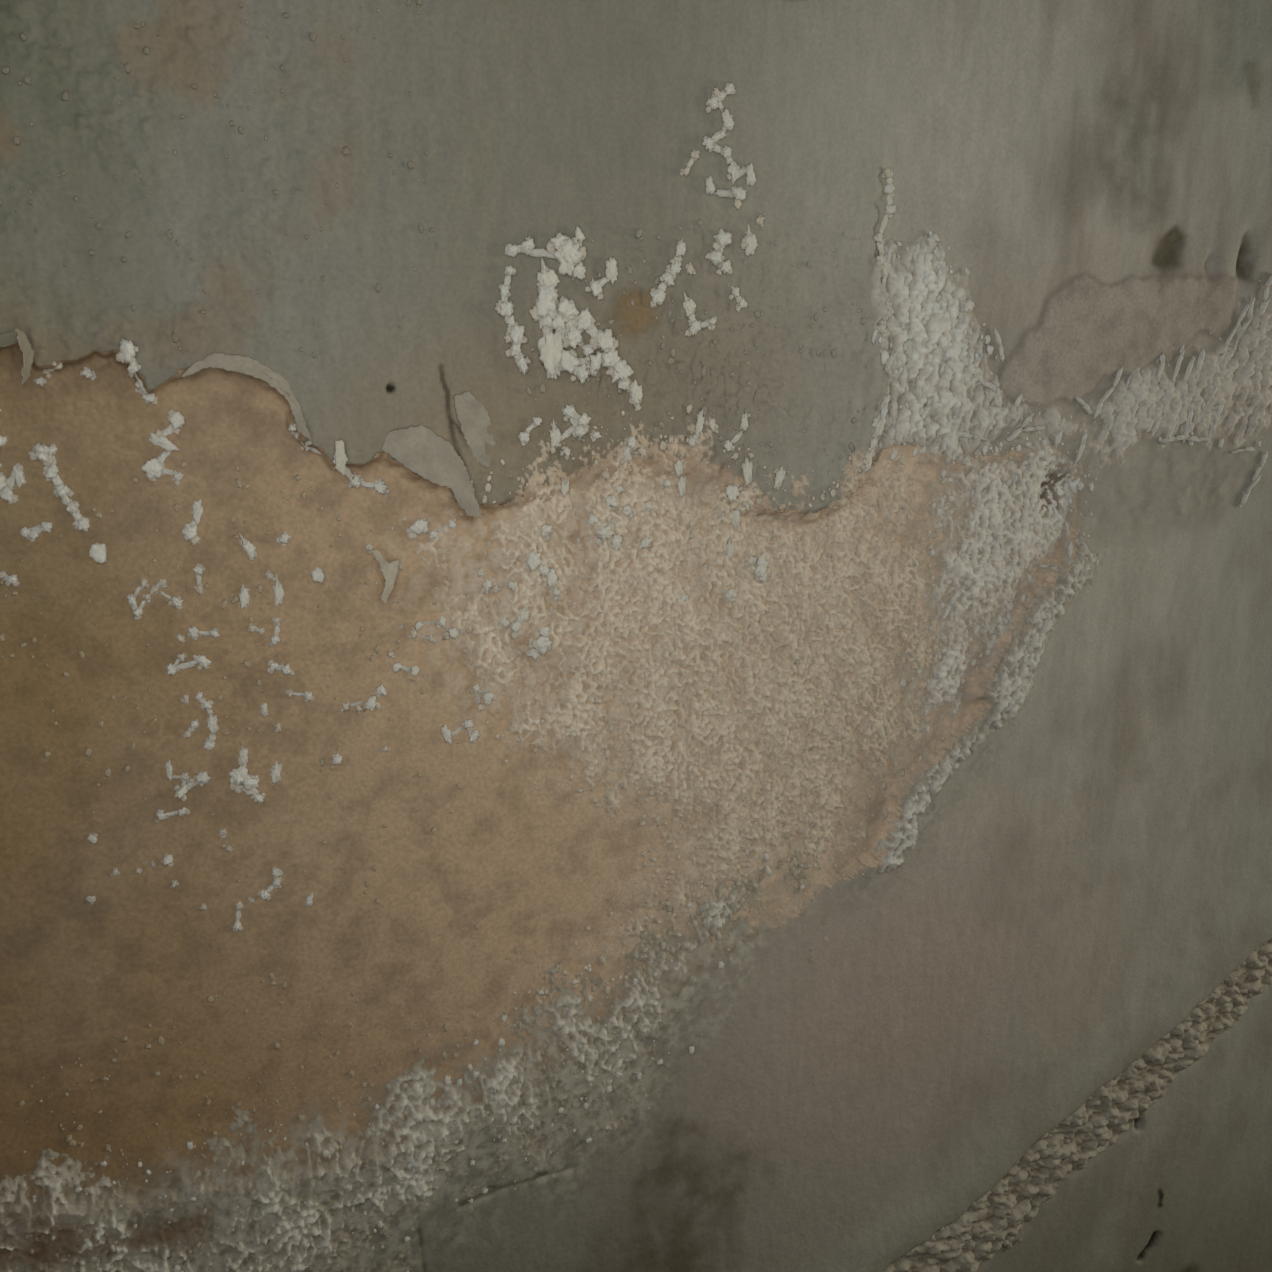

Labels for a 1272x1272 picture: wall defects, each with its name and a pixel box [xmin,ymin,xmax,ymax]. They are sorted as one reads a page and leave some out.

spalling [1155,228,1183,267]
spalling [1237,234,1247,277]
leakage [116,339,215,546]
leakage [288,423,390,495]
leakage [20,509,62,551]
leakage [221,515,261,560]
leakage [0,559,36,603]
leakage [127,558,210,626]
leakage [165,570,391,804]
spalling [0,329,1081,1186]
leakage [135,750,211,888]
leakage [229,866,305,932]